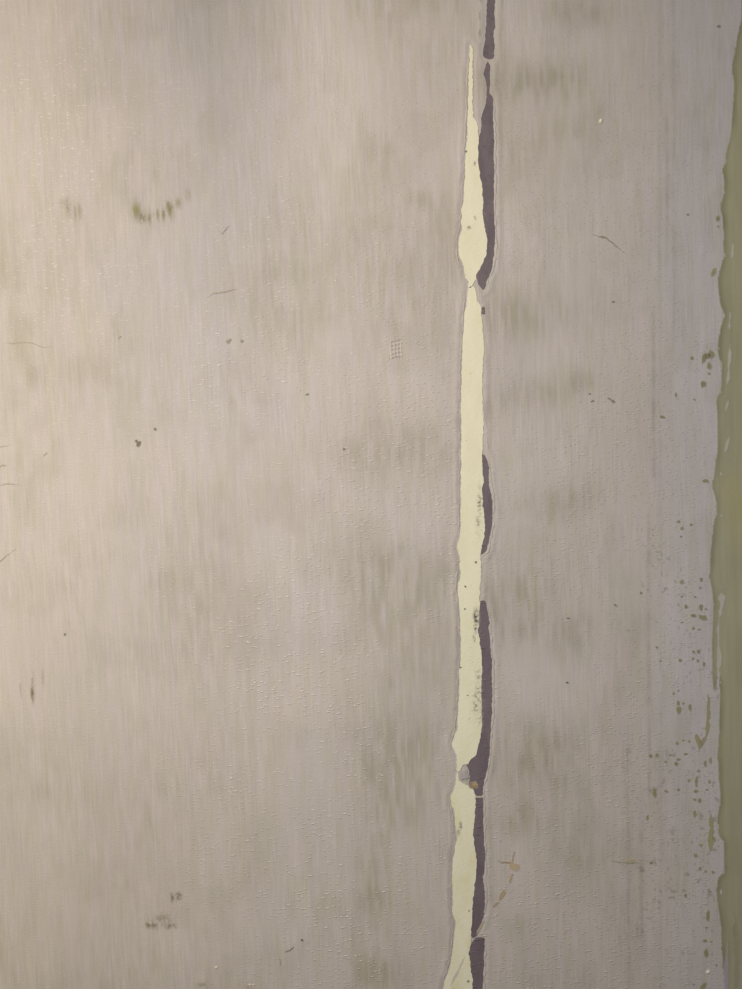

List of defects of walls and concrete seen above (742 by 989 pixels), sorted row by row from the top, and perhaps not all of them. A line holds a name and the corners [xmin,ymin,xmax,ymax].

peeling [442,0,520,989]
peeling [649,0,742,989]